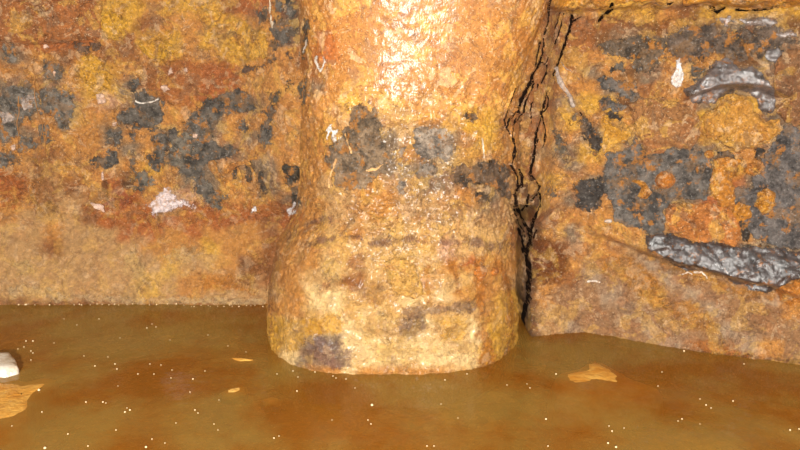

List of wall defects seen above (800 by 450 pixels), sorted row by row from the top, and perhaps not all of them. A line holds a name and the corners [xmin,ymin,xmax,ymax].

rust [0,0,132,45]
rust [552,0,667,12]
rust [683,0,800,11]
crack [709,5,777,14]
rust [138,38,239,107]
rust [84,156,292,229]
rust [519,71,555,166]
crack [503,0,614,356]
rust [601,47,800,247]
rust [203,241,351,370]
rust [399,260,518,379]
rust [639,248,800,306]